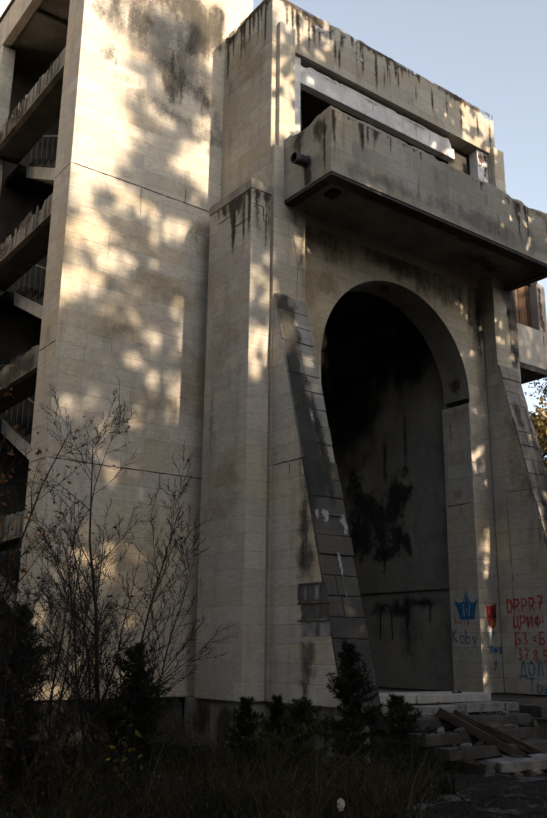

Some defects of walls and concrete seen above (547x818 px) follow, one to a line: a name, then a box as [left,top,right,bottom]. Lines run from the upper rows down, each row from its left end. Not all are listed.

damp [100,0,271,105]
damp [282,0,420,96]
damp [313,109,339,167]
damp [347,117,391,150]
damp [431,86,493,146]
damp [304,160,312,186]
damp [218,189,270,253]
damp [505,197,547,250]
damp [310,395,335,503]
damp [299,496,313,570]
damp [302,645,313,696]